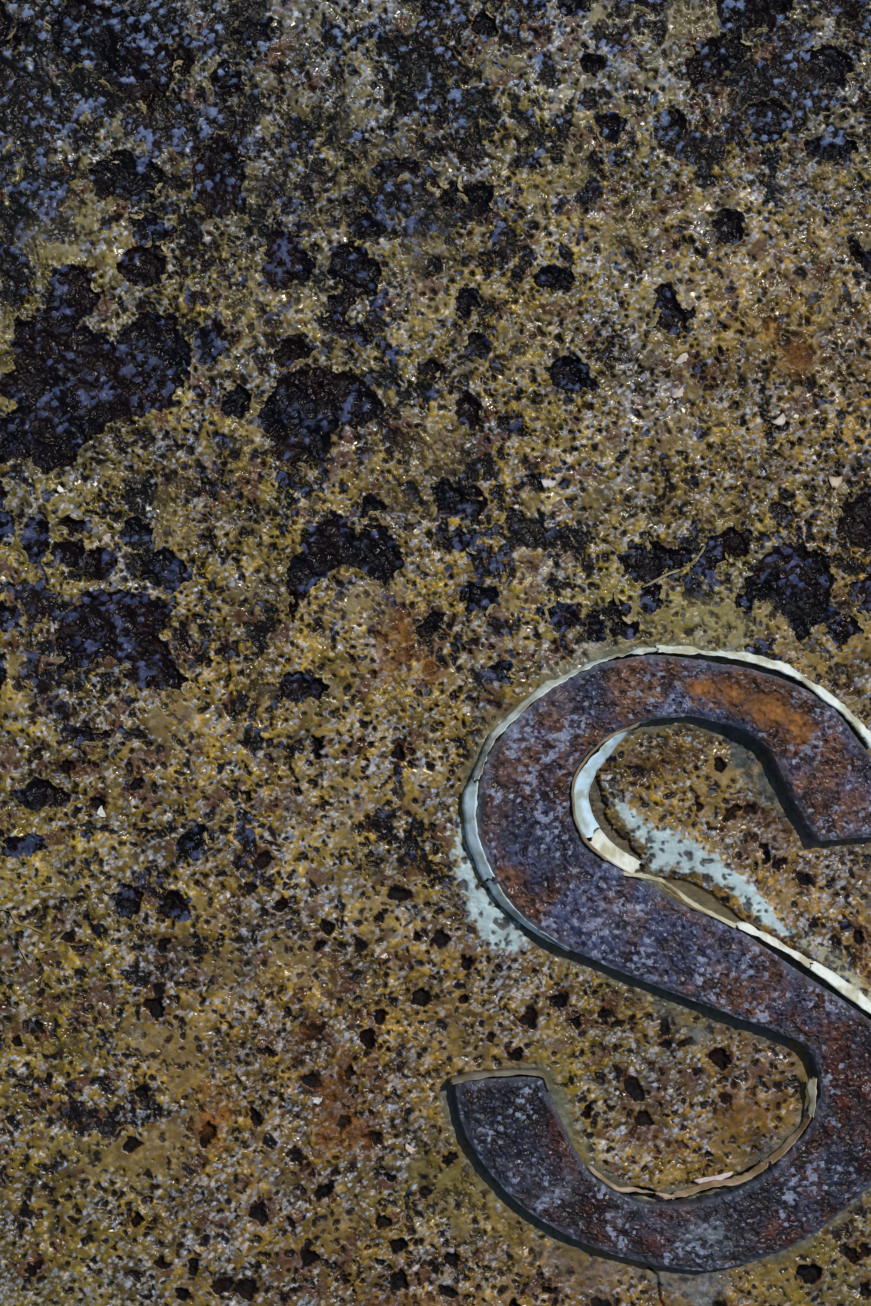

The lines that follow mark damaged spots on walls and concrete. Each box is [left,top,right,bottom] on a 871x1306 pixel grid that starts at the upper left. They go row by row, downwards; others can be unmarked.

corrosion [485,658,515,684]
corrosion [689,678,811,742]